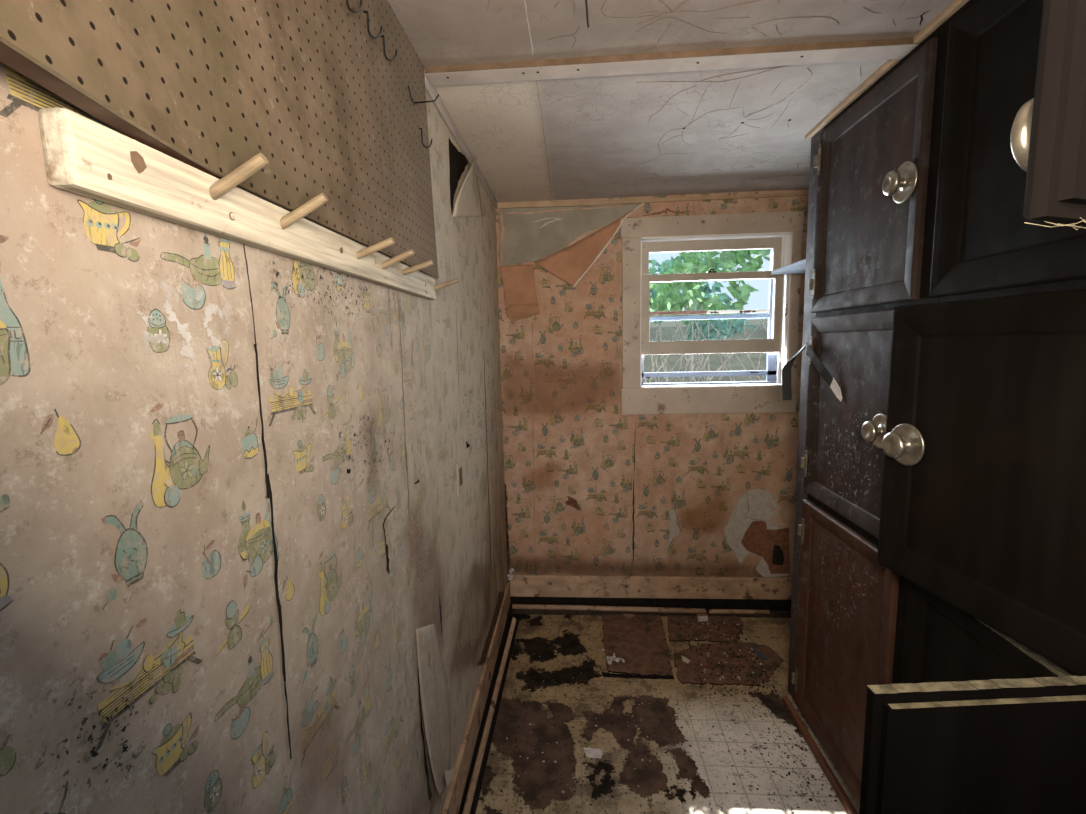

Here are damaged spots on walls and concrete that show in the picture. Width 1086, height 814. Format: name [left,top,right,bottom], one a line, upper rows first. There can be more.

crack [547,0,840,49]
crack [865,0,928,26]
crack [636,65,813,164]
peeling [500,203,644,322]
flaking render [725,488,790,577]
peeling [519,614,588,663]
damp [37,689,145,793]
peeling [416,623,455,801]
peeling [583,695,705,804]
peeling [479,796,503,814]